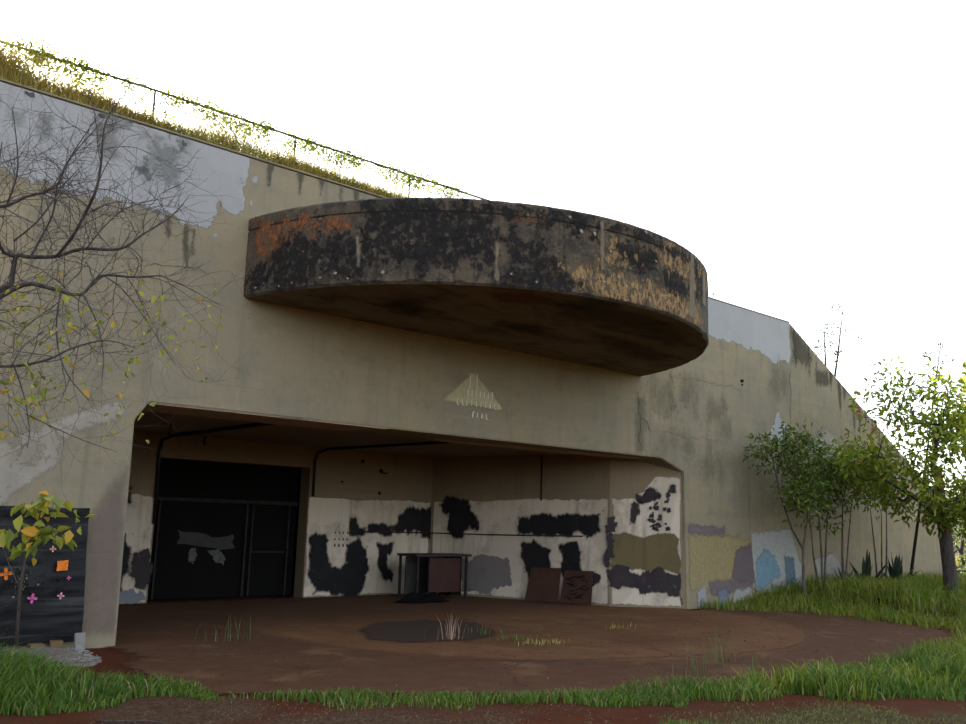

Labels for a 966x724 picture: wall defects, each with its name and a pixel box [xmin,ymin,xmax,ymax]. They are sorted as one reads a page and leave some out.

peeling [0,82,258,237]
peeling [547,229,791,364]
damp [689,253,705,318]
damp [791,328,846,408]